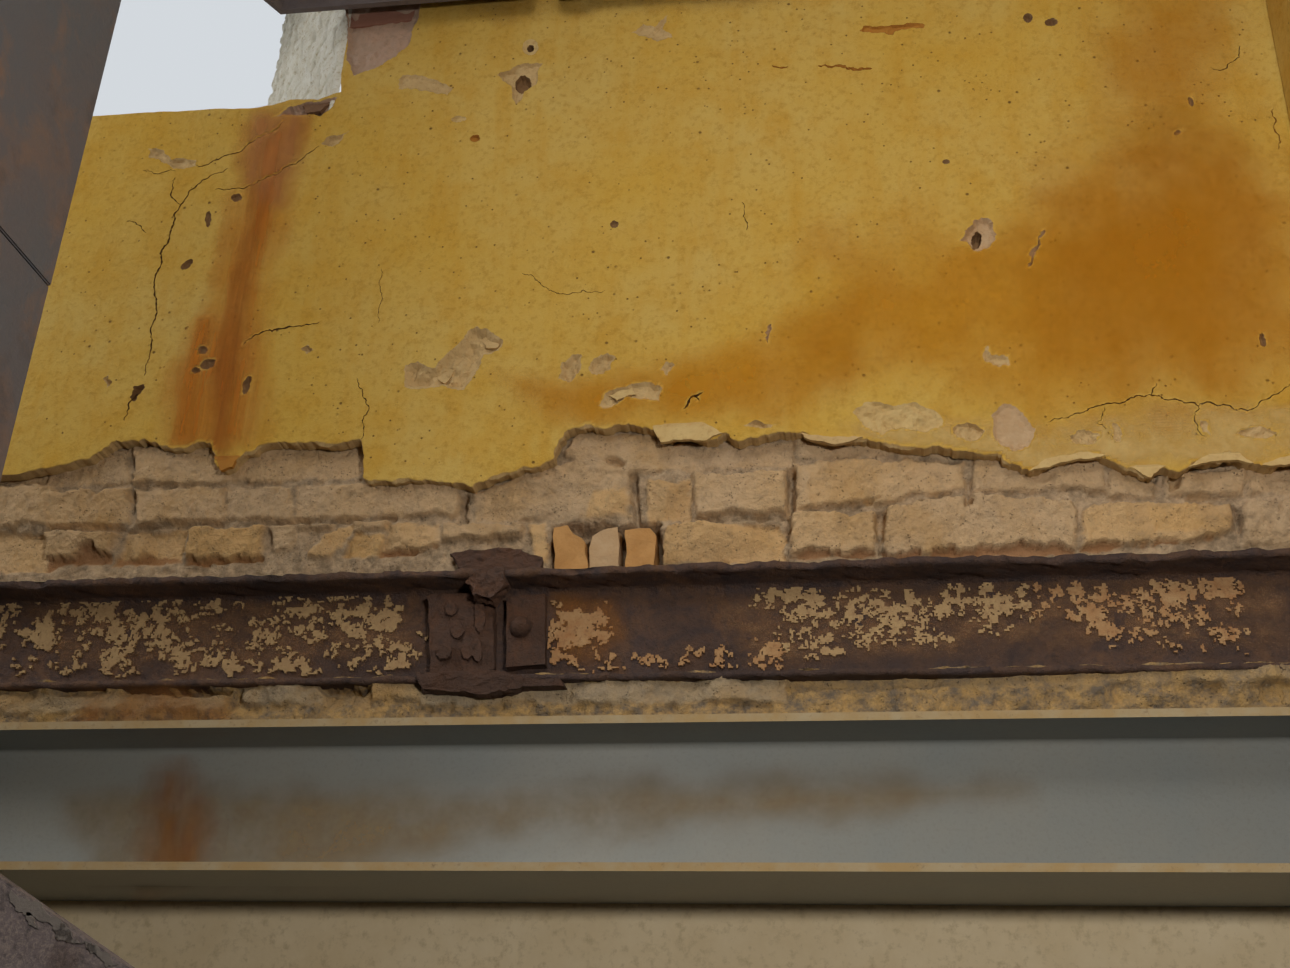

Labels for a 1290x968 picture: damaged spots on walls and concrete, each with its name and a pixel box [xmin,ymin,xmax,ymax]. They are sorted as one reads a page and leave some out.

flaking render [345,4,421,75]
spalling [498,63,543,104]
spalling [960,217,997,252]
crack [124,121,319,419]
spalling [404,326,503,390]
spalling [558,353,616,382]
spalling [598,362,675,409]
spalling [982,346,1010,367]
crack [1050,384,1290,437]
spalling [25,402,1290,492]
leakage [934,410,1290,466]